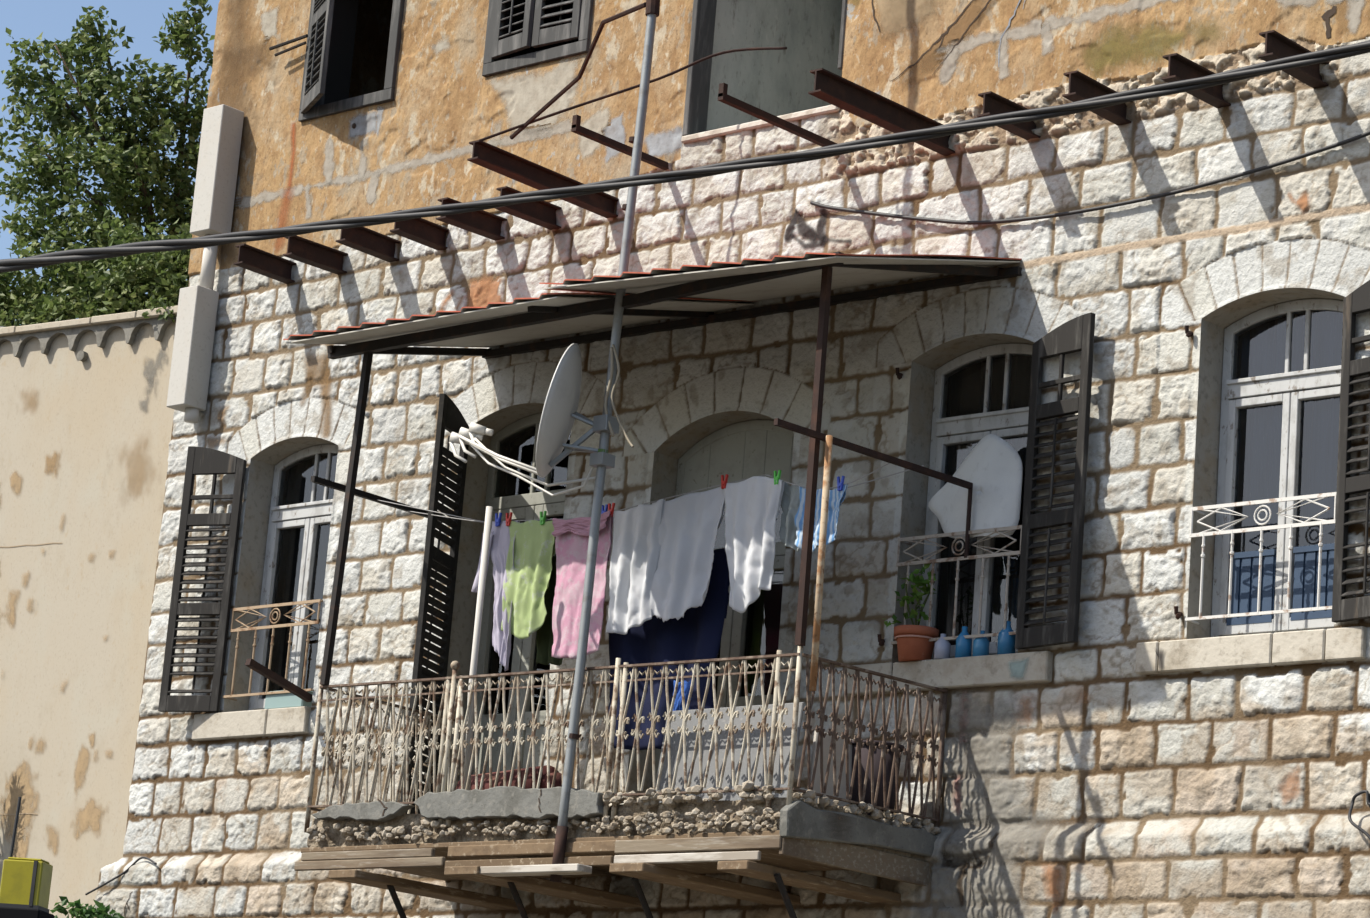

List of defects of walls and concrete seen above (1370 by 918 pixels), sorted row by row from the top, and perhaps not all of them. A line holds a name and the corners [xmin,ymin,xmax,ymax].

crack [890,0,1025,82]
flaking render [935,0,1177,82]
flaking render [1277,0,1364,33]
flaking render [646,127,683,156]
rust [280,123,295,228]
peeling [10,472,21,494]
peeling [8,573,31,626]
peeling [75,734,111,790]
peeling [2,740,44,858]
peeling [48,827,58,854]
peeling [76,800,102,838]
spalling [307,780,941,844]